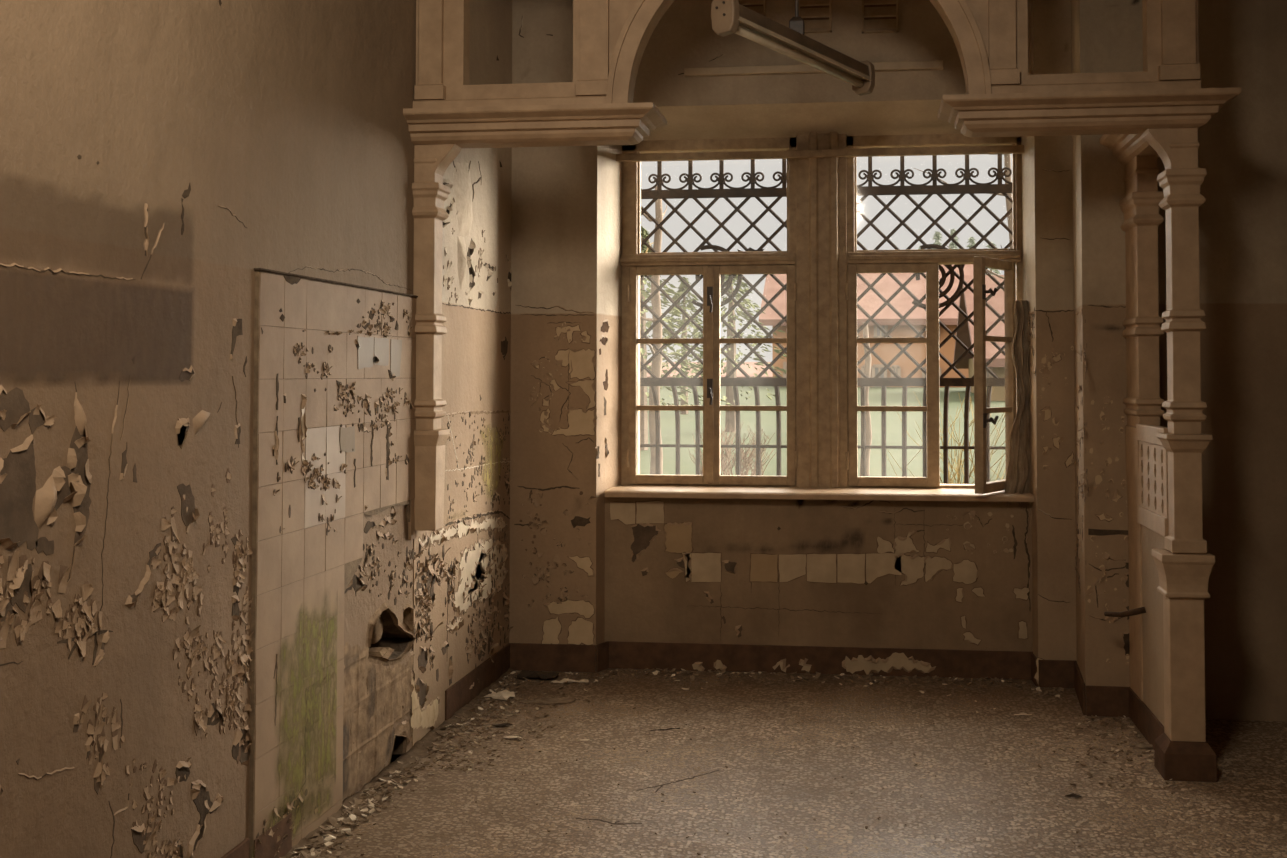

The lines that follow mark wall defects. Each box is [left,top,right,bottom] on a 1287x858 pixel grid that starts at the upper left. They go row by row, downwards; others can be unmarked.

peeling [442,179,512,306]
peeling [0,385,110,667]
crack [57,381,130,665]
peeling [73,692,224,858]
peeling [125,469,258,766]
crack [218,376,239,448]
water stain [268,610,349,836]
peeling [273,299,416,535]
spalling [343,396,515,799]
peeling [530,319,610,477]
peeling [610,500,985,646]
spalling [842,652,936,675]